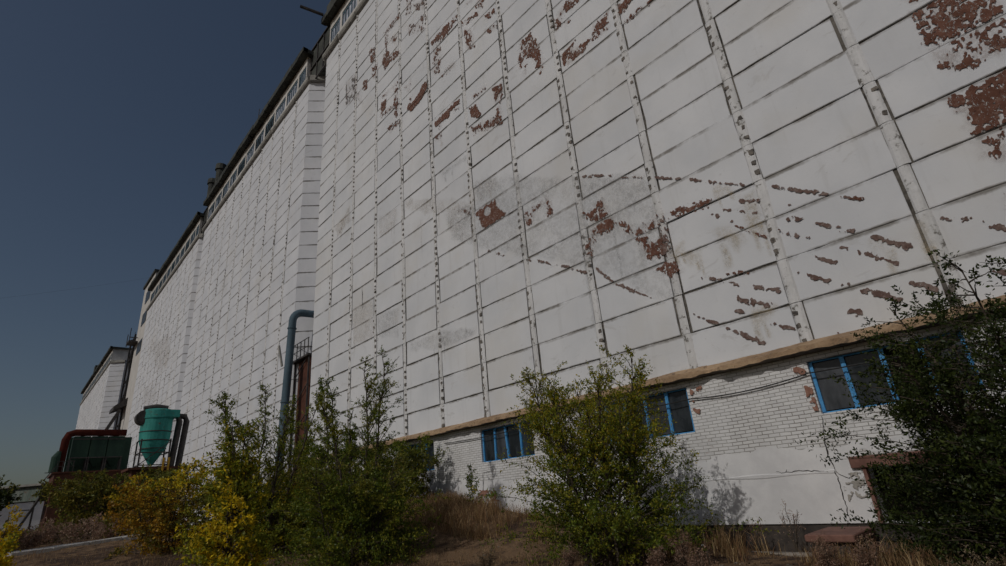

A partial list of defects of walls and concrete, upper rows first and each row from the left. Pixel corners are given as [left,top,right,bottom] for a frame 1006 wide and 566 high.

peeling [345,0,424,104]
peeling [381,0,497,130]
peeling [518,32,544,74]
peeling [560,0,651,66]
peeling [909,0,1006,71]
peeling [434,84,503,139]
peeling [947,70,1006,159]
peeling [458,199,506,228]
peeling [582,198,767,278]
peeling [771,184,864,201]
peeling [701,270,781,313]
peeling [797,272,903,302]